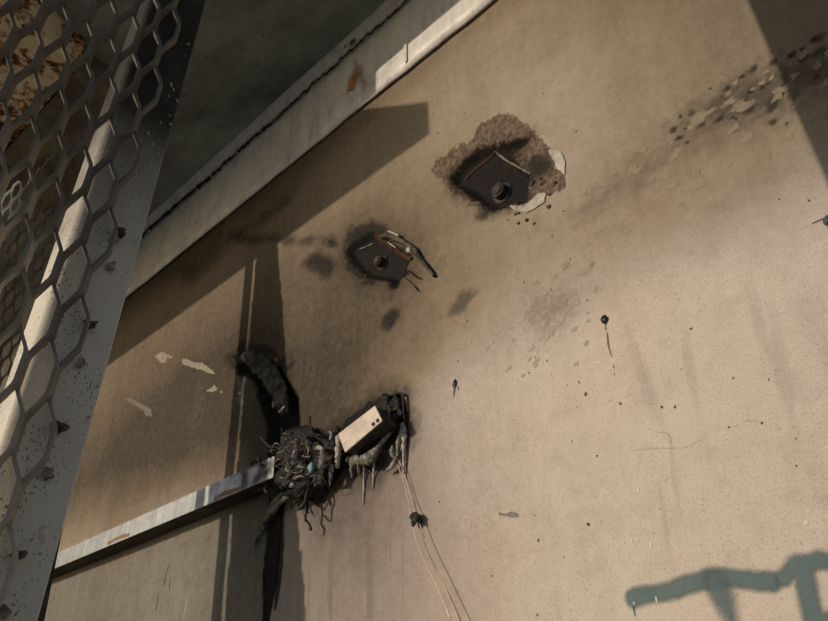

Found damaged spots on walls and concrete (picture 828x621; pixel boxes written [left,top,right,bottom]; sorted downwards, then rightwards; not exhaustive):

spalling [431,114,566,225]
peeling [155,352,172,363]
peeling [182,359,215,374]
spalling [227,342,300,450]
peeling [125,397,152,417]